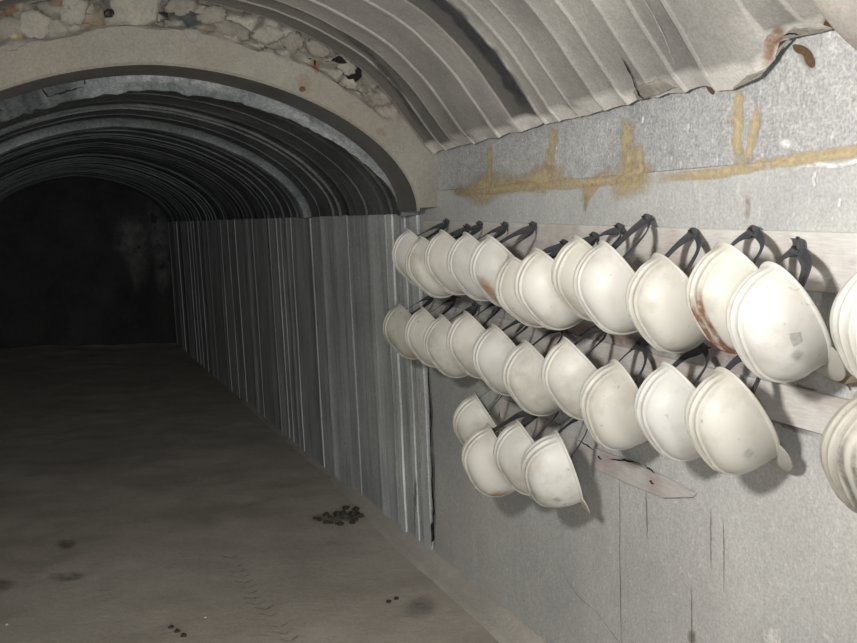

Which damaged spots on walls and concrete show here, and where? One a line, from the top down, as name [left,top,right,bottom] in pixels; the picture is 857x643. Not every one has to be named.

spalling [0,0,90,40]
spalling [102,0,362,82]
crack [616,537,624,618]
crack [710,511,724,586]